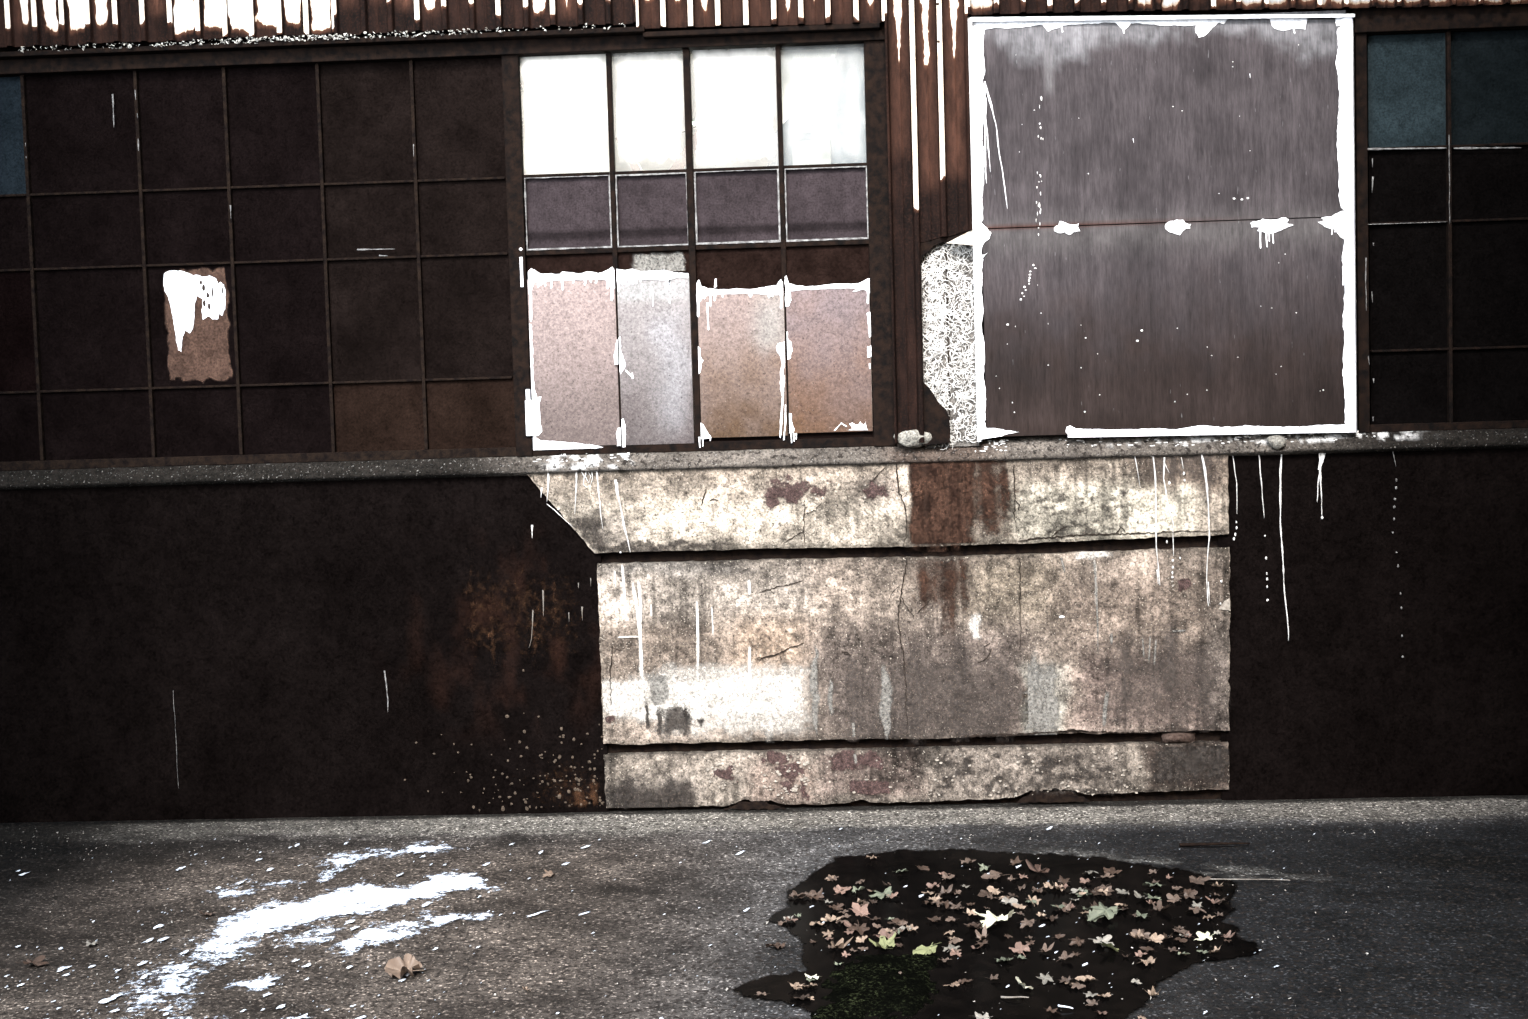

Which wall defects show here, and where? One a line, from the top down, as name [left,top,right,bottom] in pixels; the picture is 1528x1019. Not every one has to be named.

peeling [163,270,226,351]
water stain [541,488,722,552]
corrosion [909,461,1010,546]
water stain [619,580,652,649]
corrosion [914,562,968,628]
water stain [969,615,981,638]
water stain [602,664,806,737]
water stain [848,657,1059,734]
corrosion [573,783,598,806]
water stain [606,777,695,808]